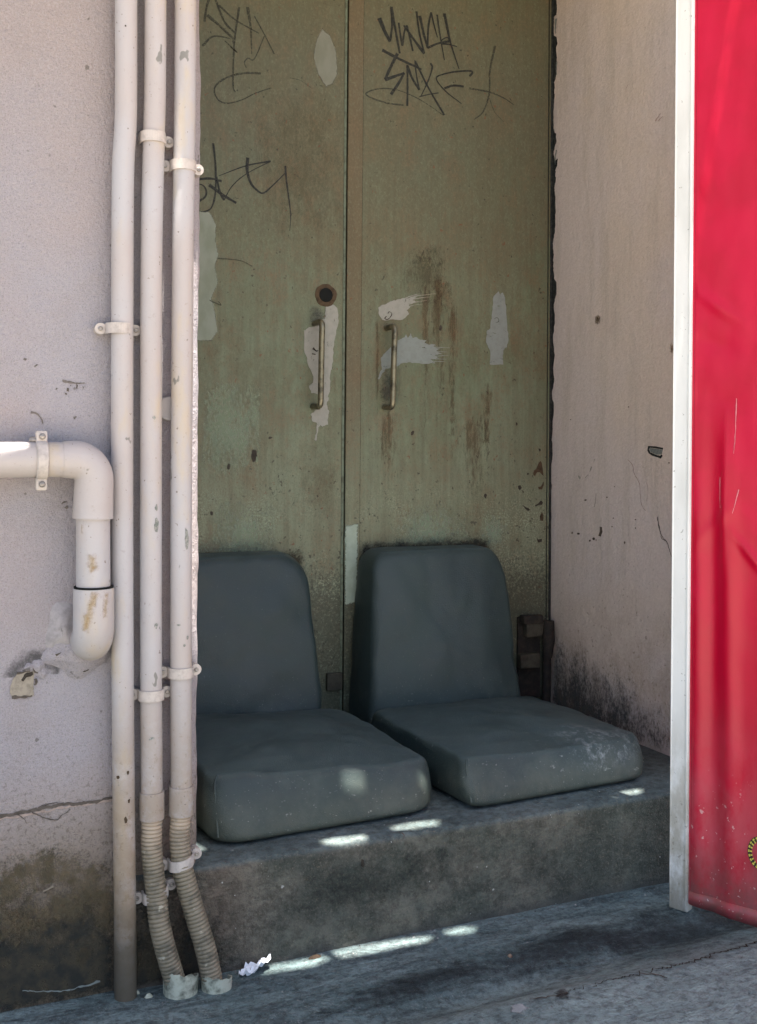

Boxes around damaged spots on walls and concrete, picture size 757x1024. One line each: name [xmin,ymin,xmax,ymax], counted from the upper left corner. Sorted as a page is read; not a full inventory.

spalling [9,653,58,699]
leakage [553,649,661,744]
crack [0,797,112,822]
leakage [0,848,114,1013]
crack [534,941,757,999]